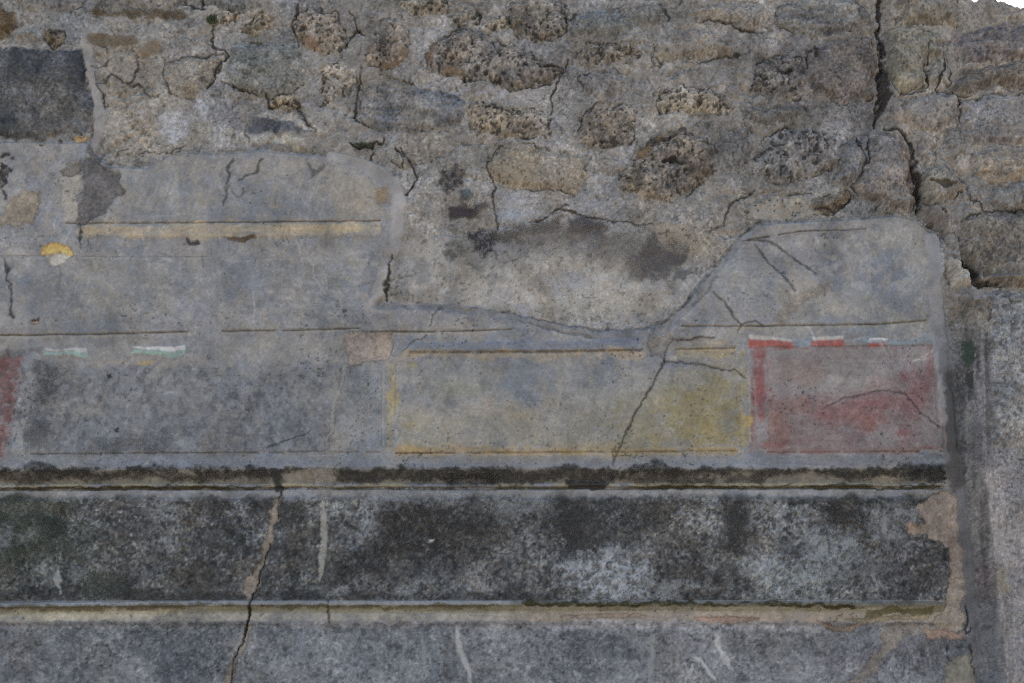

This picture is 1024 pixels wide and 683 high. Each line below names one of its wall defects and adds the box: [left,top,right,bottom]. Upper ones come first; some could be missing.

crack [908,53,946,95]
flaking render [61,136,125,225]
flaking render [740,195,818,222]
crack [613,336,734,459]
water stain [0,456,307,492]
water stain [334,459,946,556]
crack [225,491,282,683]
flaking render [821,491,967,640]